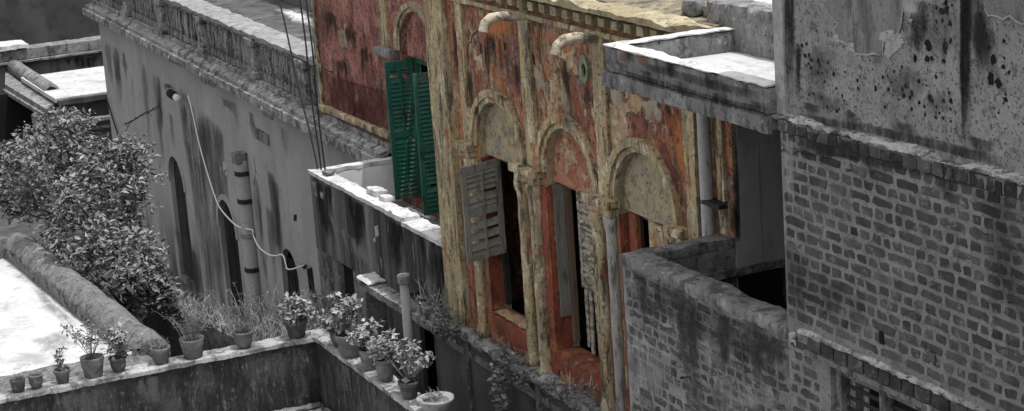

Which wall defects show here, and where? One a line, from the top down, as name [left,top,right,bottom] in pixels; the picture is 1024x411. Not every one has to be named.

peeling [827,0,921,60]
peeling [473,47,485,72]
peeling [533,45,579,103]
water stain [785,0,1010,191]
peeling [609,89,680,195]
water stain [180,110,224,289]
water stain [257,175,281,246]
water stain [316,182,331,234]
water stain [348,198,365,246]
water stain [388,223,403,266]
water stain [420,238,445,295]